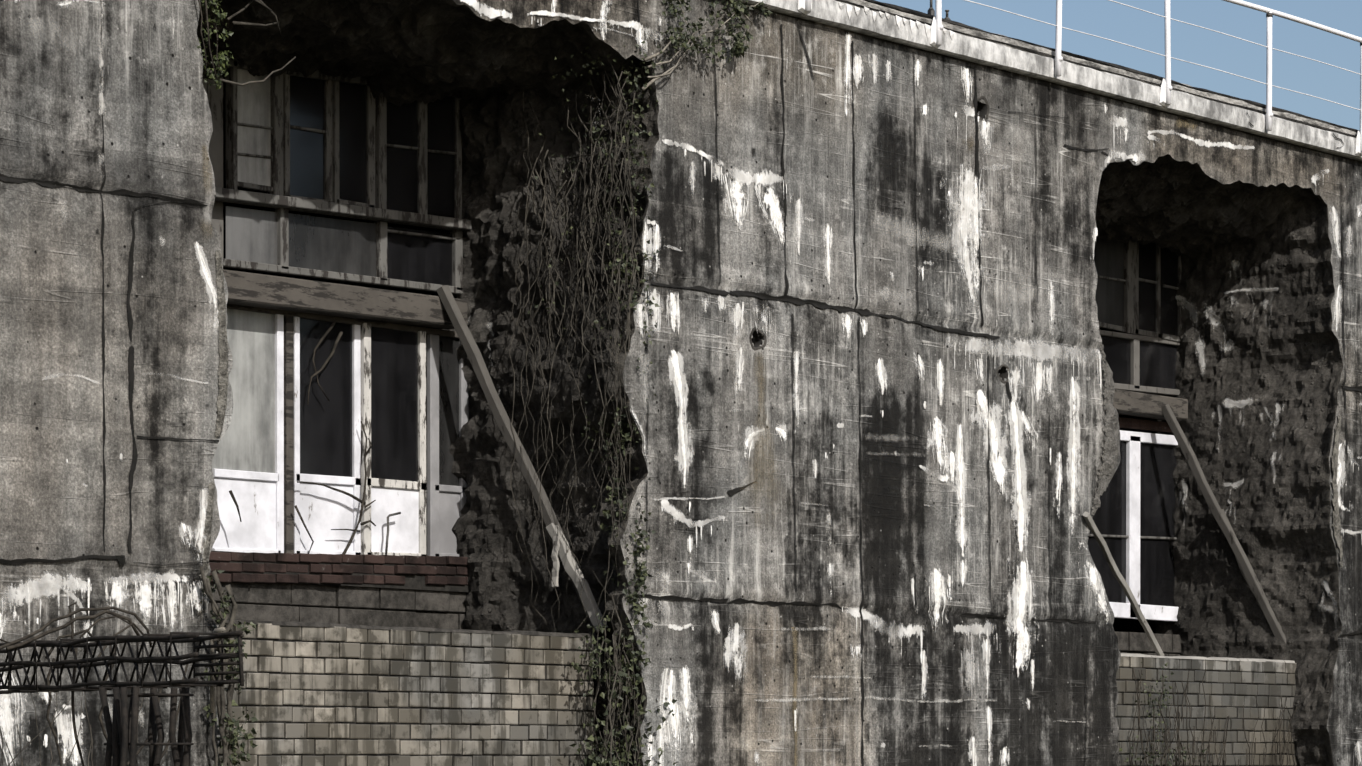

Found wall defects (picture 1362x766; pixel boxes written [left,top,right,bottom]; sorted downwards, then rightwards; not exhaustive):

efflorescence [684,144,800,253]
crack [0,173,219,566]
spalling [206,250,229,438]
efflorescence [0,672,84,766]
water stain [104,578,203,627]
spalling [166,482,215,614]
efflorescence [648,667,693,766]
efflorescence [661,350,712,578]
crack [635,594,907,766]
efflorescence [911,339,1109,707]
crack [961,613,1095,624]
spalling [1331,415,1343,568]